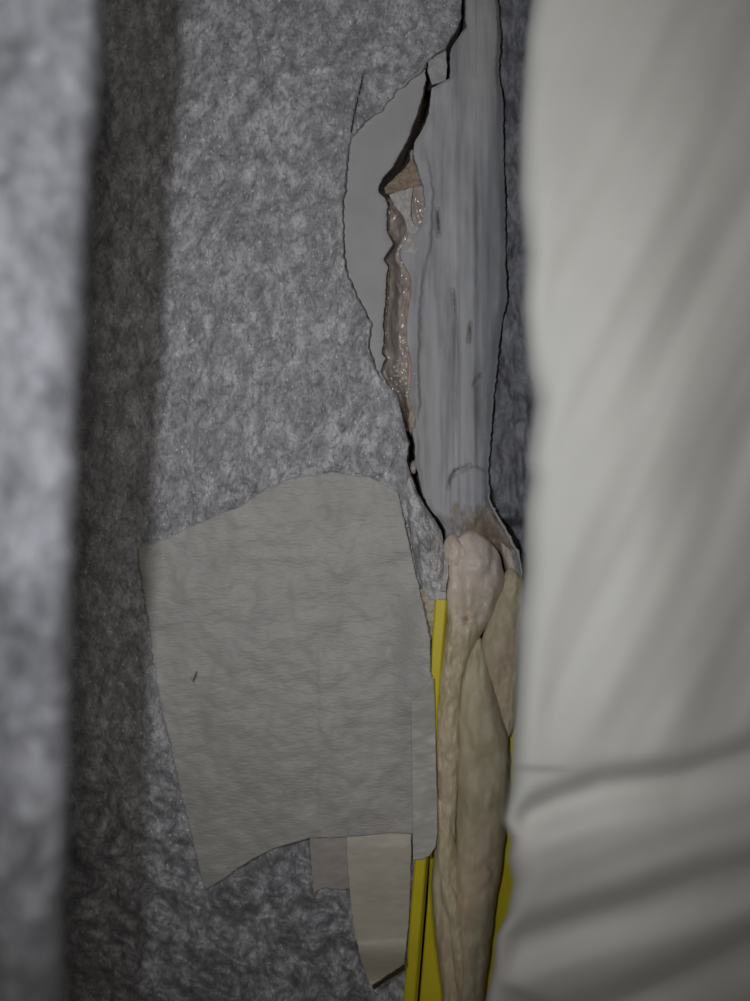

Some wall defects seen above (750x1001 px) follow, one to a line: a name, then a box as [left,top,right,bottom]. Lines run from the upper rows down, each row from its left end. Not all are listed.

peeling [343,51,447,378]